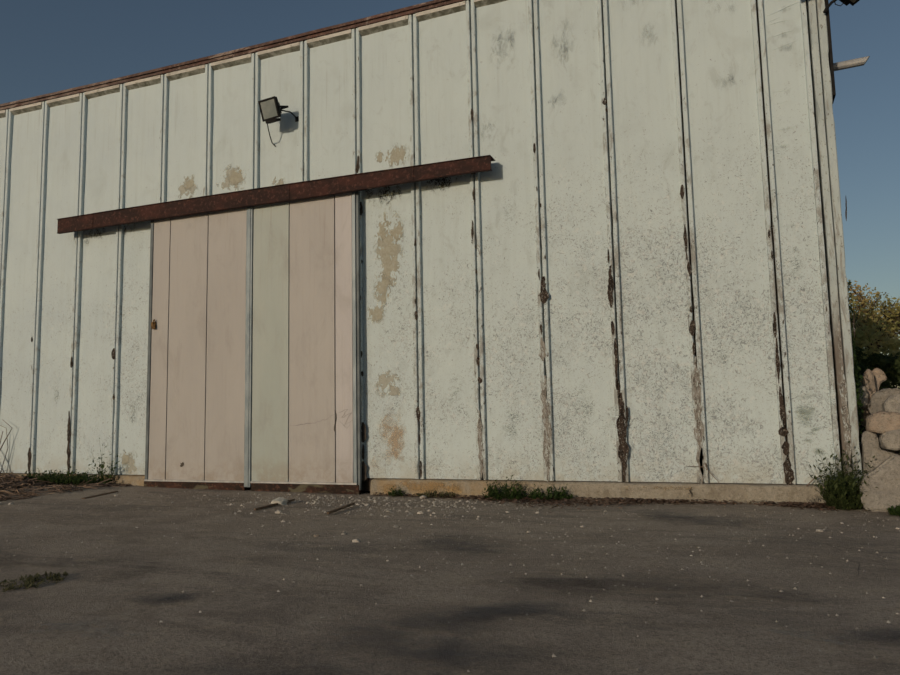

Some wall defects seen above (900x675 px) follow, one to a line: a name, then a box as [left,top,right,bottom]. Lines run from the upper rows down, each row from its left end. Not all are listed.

peeling [376,146,406,166]
peeling [178,176,195,198]
peeling [221,168,243,190]
peeling [369,215,403,321]
peeling [376,371,400,396]